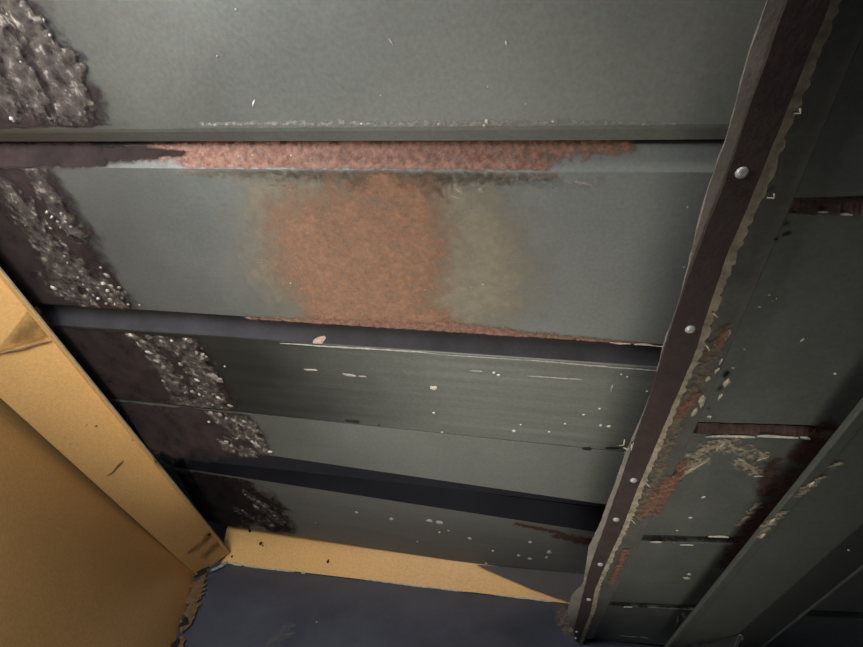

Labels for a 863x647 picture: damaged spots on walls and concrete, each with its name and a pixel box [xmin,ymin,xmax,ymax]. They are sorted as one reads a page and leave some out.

corrosion [0,140,663,347]
peeling [672,438,771,478]
peeling [794,461,844,497]
peeling [755,511,787,539]